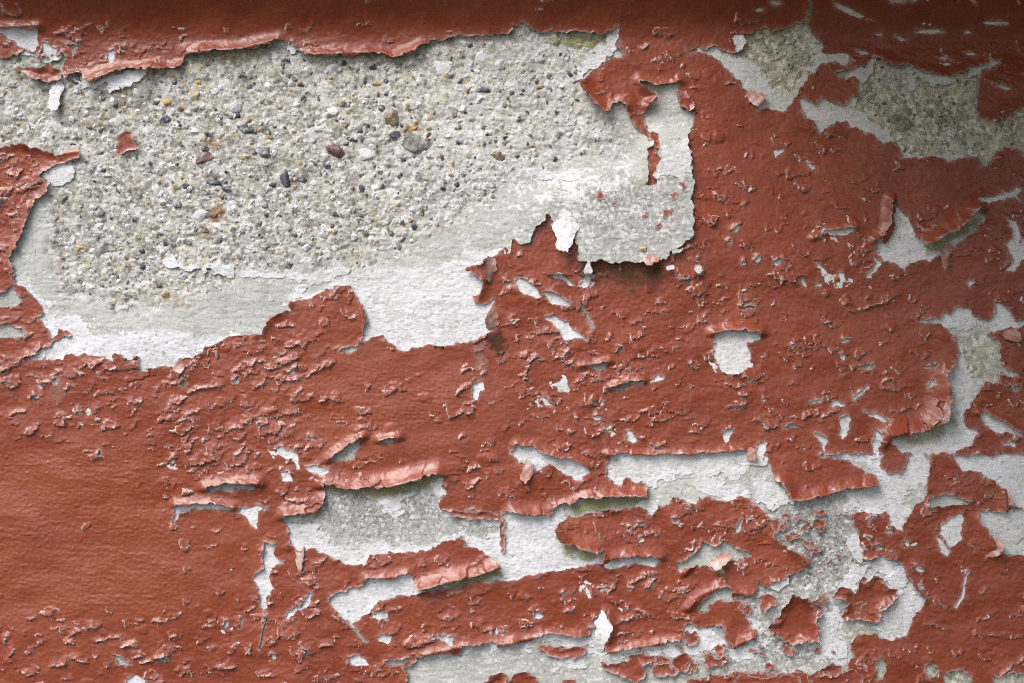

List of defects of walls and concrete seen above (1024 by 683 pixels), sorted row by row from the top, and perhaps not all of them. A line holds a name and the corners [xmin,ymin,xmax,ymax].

spalling [687,1,1024,167]
spalling [0,22,695,387]
peeling [866,187,1024,278]
peeling [172,483,268,529]
spalling [253,301,1024,683]